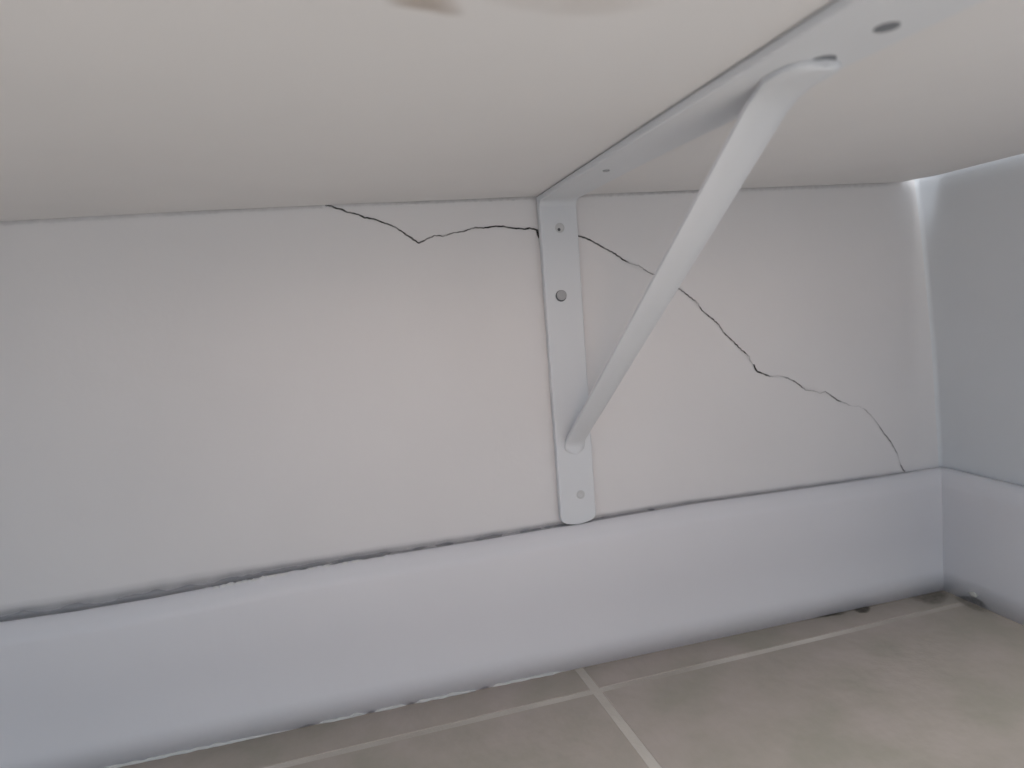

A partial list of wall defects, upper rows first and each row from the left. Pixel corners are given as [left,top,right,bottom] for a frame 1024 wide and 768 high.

crack [325,205,539,244]
crack [578,235,654,275]
crack [678,288,840,402]